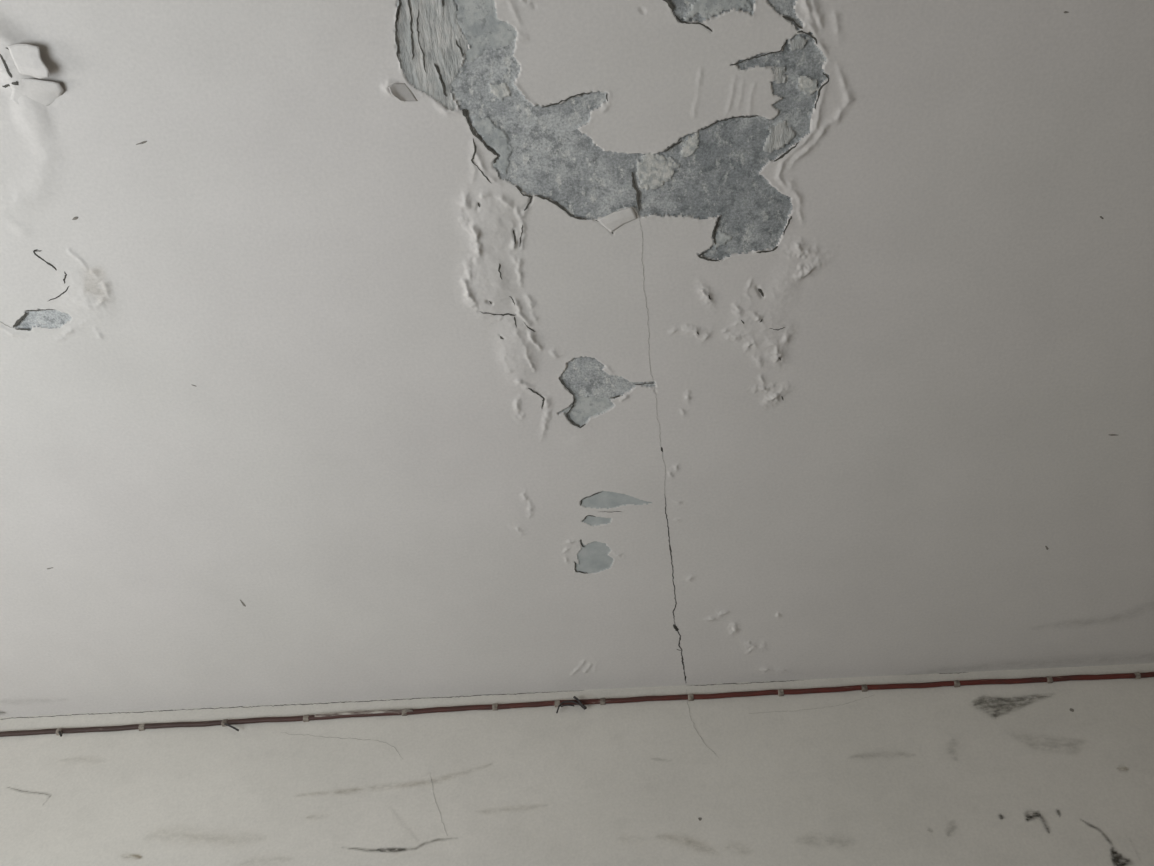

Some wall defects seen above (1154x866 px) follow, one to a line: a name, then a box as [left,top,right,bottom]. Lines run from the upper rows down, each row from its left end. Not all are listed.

peeling [377,0,859,270]
peeling [0,245,128,344]
peeling [548,349,667,434]
peeling [558,485,659,577]
crack [639,214,796,757]